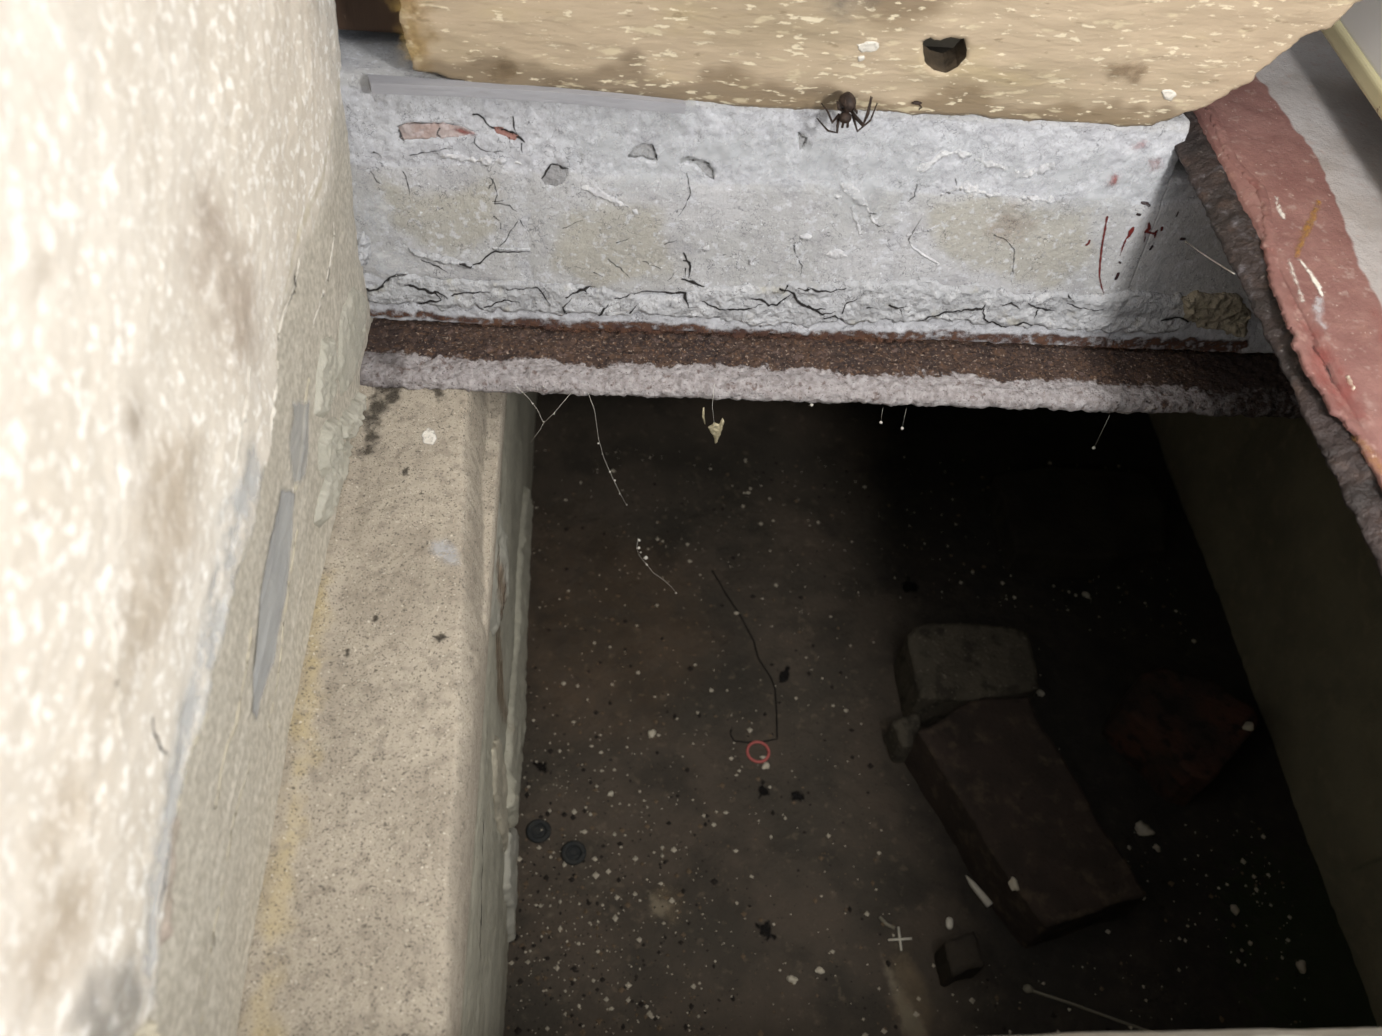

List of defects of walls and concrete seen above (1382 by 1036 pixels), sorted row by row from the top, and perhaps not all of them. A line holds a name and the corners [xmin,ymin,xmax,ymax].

peeling [397,122,475,141]
crack [372,113,530,270]
crack [593,173,705,287]
peeling [314,287,367,528]